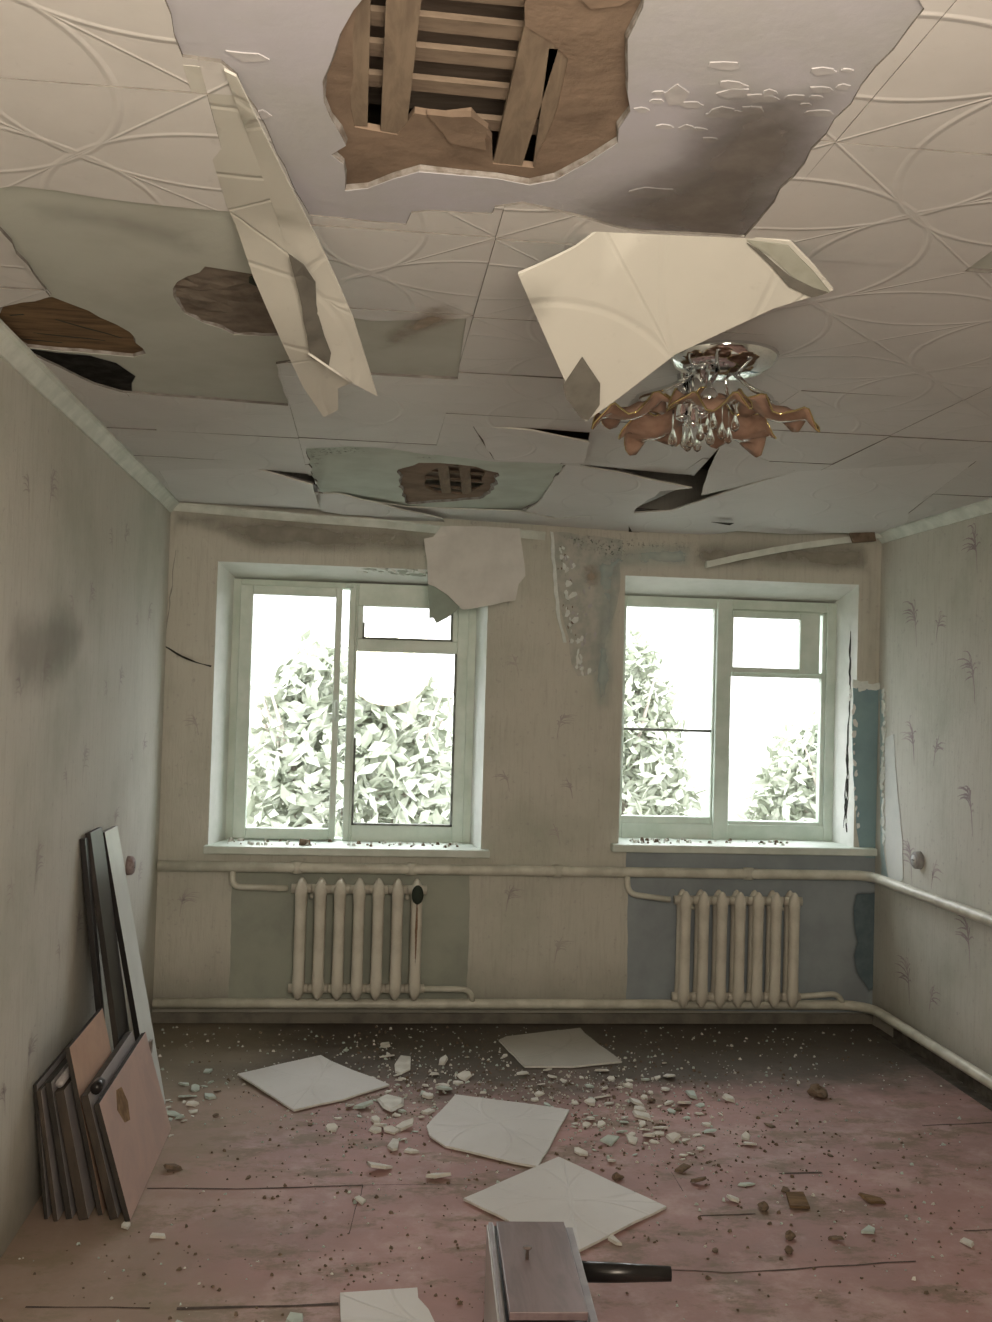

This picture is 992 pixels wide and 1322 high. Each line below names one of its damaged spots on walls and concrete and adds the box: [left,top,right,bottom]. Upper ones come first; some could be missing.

flaking render [0,186,290,403]
flaking render [166,0,923,230]
water stain [618,106,828,298]
flaking render [306,446,563,510]
crack [166,551,212,667]
flaking render [550,531,623,676]